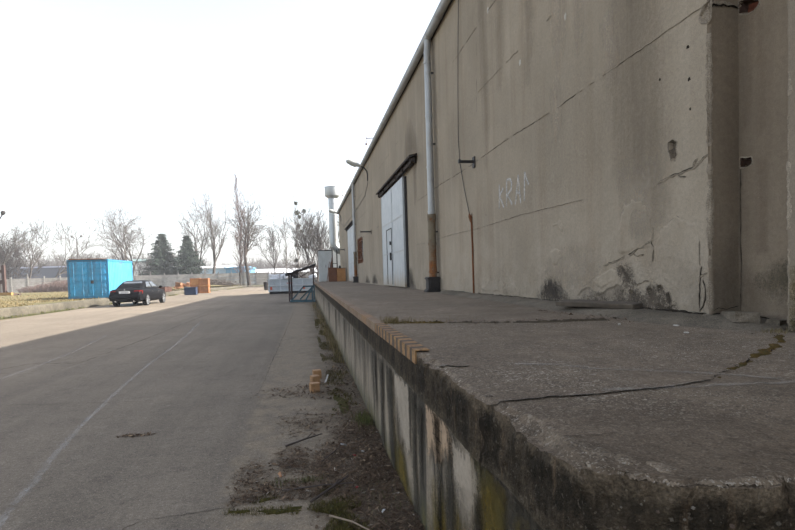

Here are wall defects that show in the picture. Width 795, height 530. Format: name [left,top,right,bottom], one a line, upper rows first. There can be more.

spalling [738,0,761,16]
crack [417,0,739,201]
spalling [667,138,678,162]
crack [603,232,654,266]
damp [583,263,675,310]
crack [642,169,742,315]
damp [329,309,543,530]
crack [479,316,786,466]